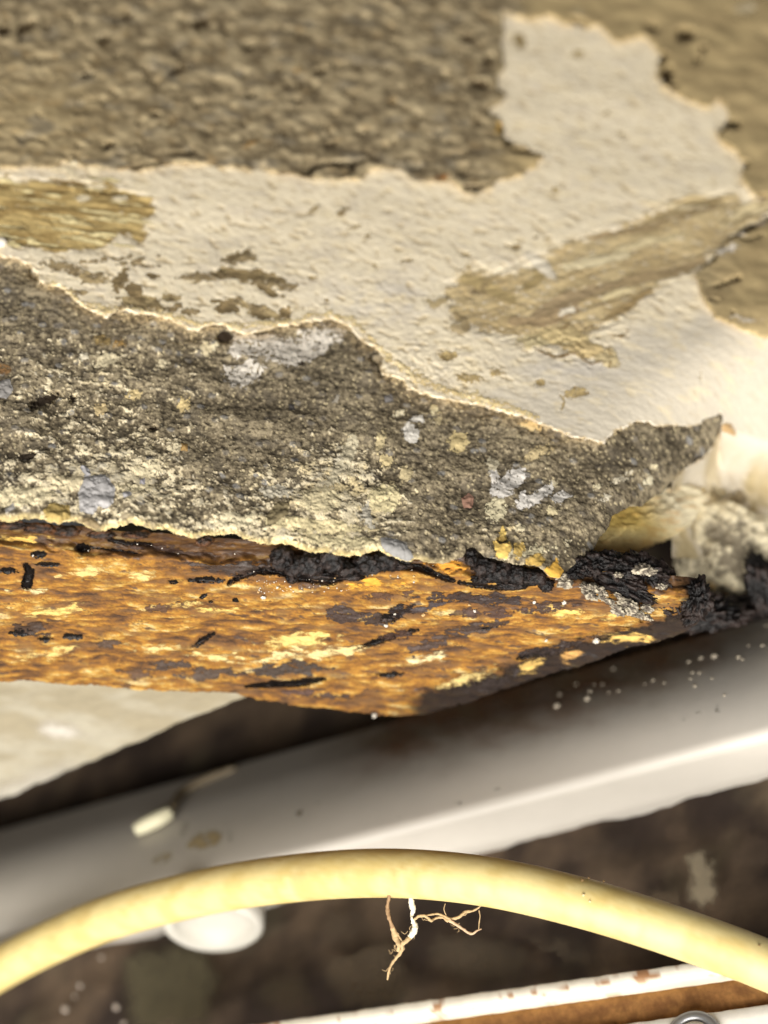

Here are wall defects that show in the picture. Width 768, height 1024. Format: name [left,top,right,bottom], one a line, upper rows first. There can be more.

flaking render [0,10,768,592]
rust [0,520,152,540]
rust [195,535,216,547]
rust [269,545,414,584]
rust [366,526,768,754]